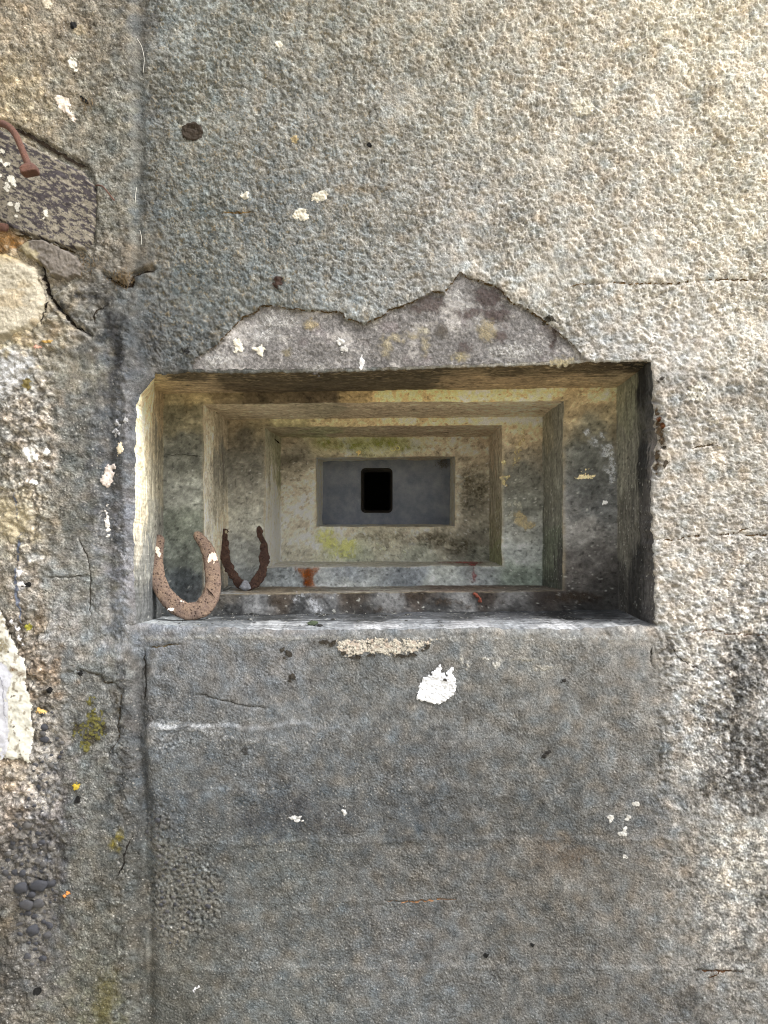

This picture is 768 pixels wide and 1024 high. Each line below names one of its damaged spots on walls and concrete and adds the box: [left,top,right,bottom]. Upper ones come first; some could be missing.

crack [40,267,153,334]
spalling [191,272,585,370]
crack [573,278,767,286]
crack [116,836,133,879]